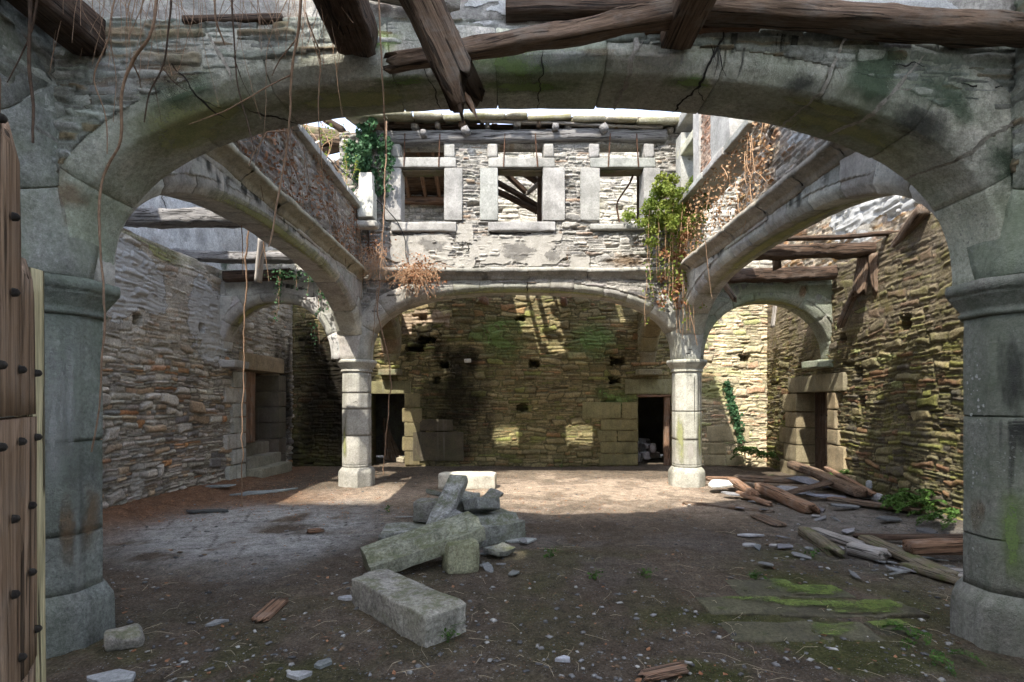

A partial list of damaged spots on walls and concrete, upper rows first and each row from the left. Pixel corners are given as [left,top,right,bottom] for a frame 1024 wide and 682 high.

crack [536,52,544,108]
crack [672,32,726,113]